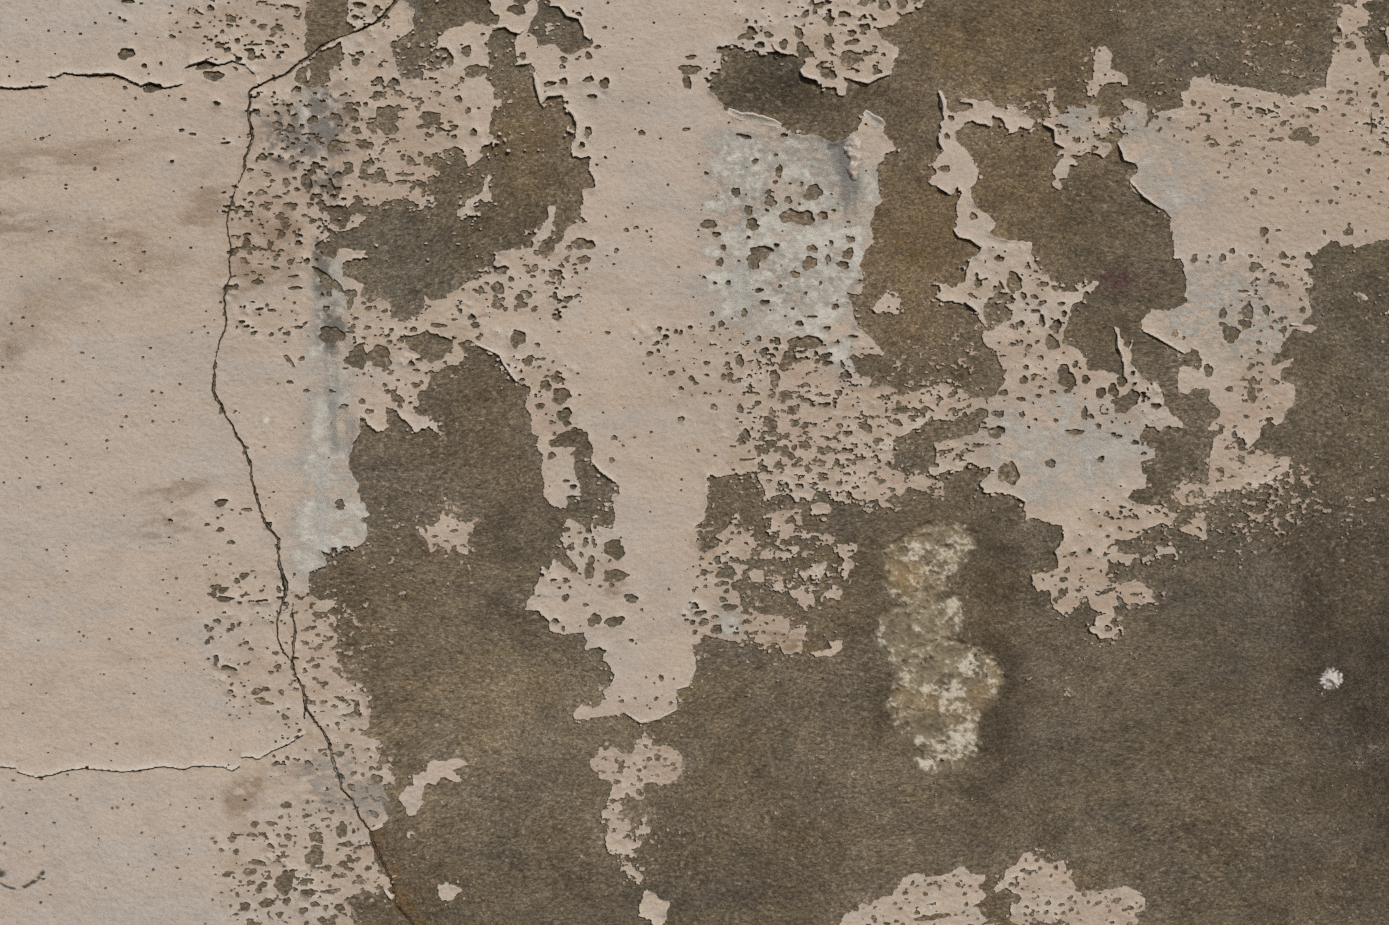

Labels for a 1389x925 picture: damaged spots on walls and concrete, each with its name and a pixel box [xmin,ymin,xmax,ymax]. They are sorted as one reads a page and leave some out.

peeling [292,0,356,92]
crack [0,0,412,925]
peeling [311,0,1389,859]
peeling [437,881,462,901]
peeling [839,848,1145,925]